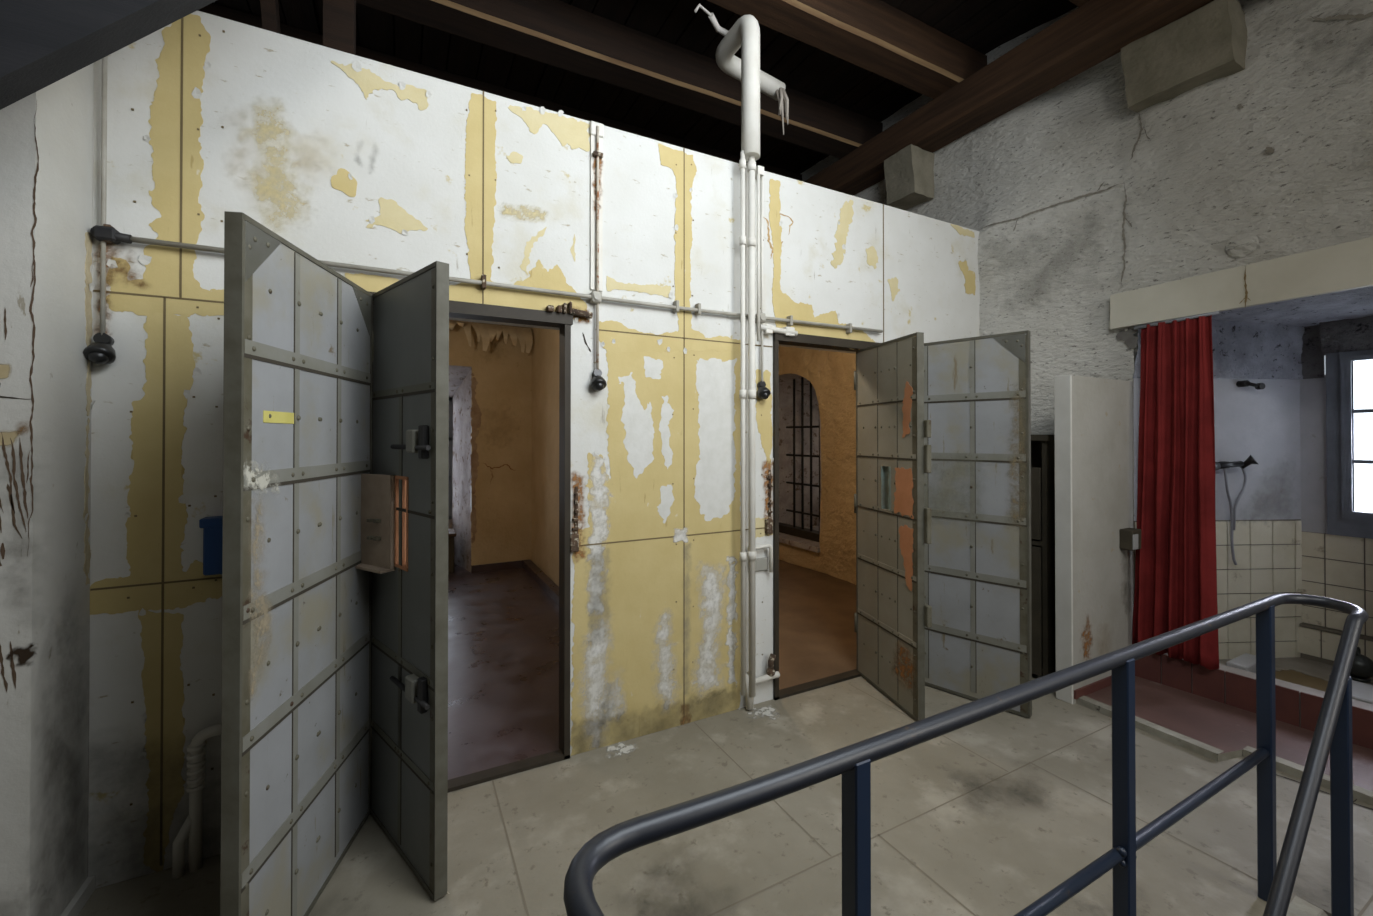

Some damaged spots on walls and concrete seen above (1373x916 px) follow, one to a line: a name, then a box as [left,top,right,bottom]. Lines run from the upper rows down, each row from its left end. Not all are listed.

crack [1309,12,1373,25]
peeling [331,60,432,110]
peeling [331,168,357,197]
peeling [366,197,428,235]
crack [981,114,1150,285]
peeling [345,273,399,292]
peeling [449,93,774,756]
corrosion [0,426,28,566]
corrosion [1082,618,1092,658]
corrosion [0,641,35,692]